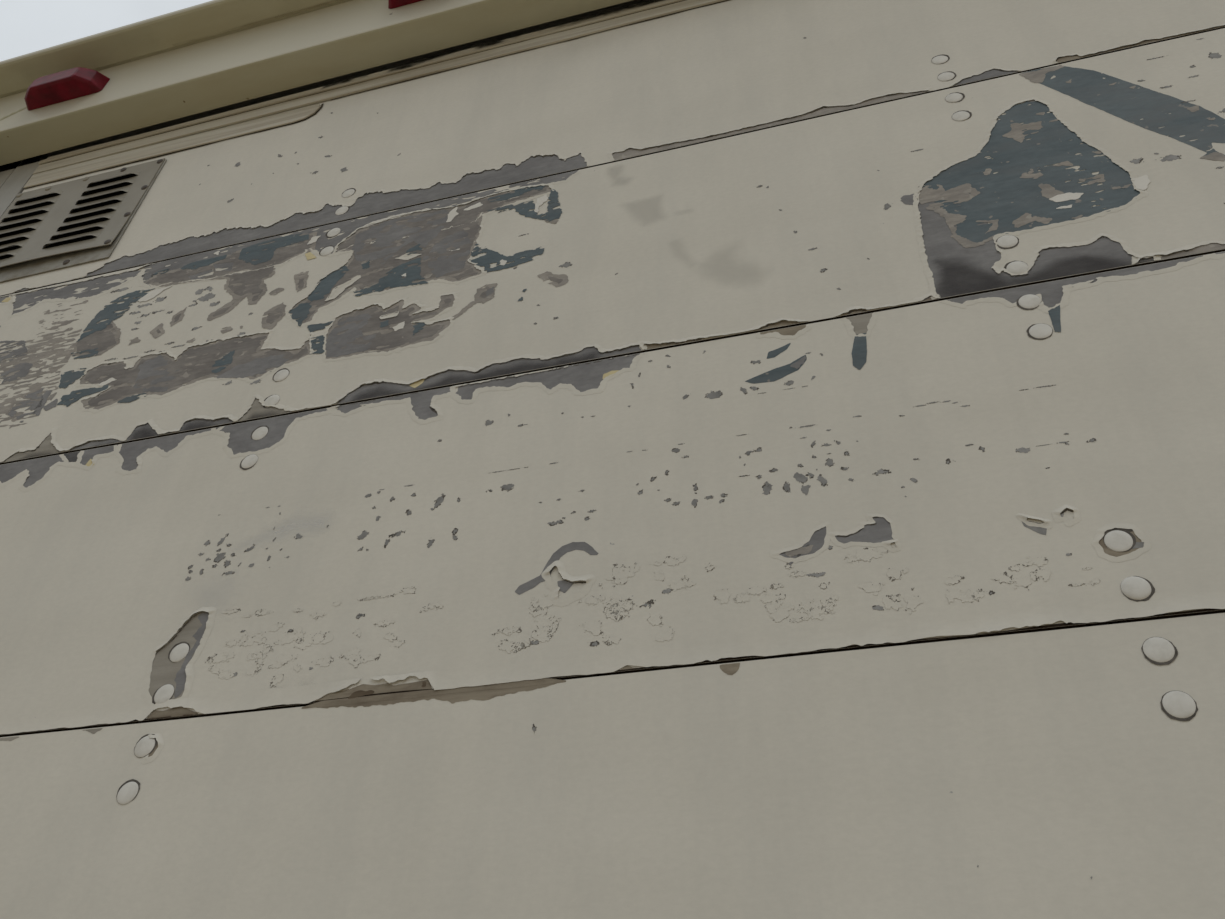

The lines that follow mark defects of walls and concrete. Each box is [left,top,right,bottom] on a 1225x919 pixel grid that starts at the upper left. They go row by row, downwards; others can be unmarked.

peeling [607,87,933,161]
peeling [835,65,1225,370]
peeling [0,151,823,492]
peeling [185,506,289,581]
peeling [357,489,405,551]
peeling [492,542,696,653]
peeling [636,470,728,508]
peeling [739,424,858,495]
peeling [714,513,924,622]
peeling [317,683,556,708]